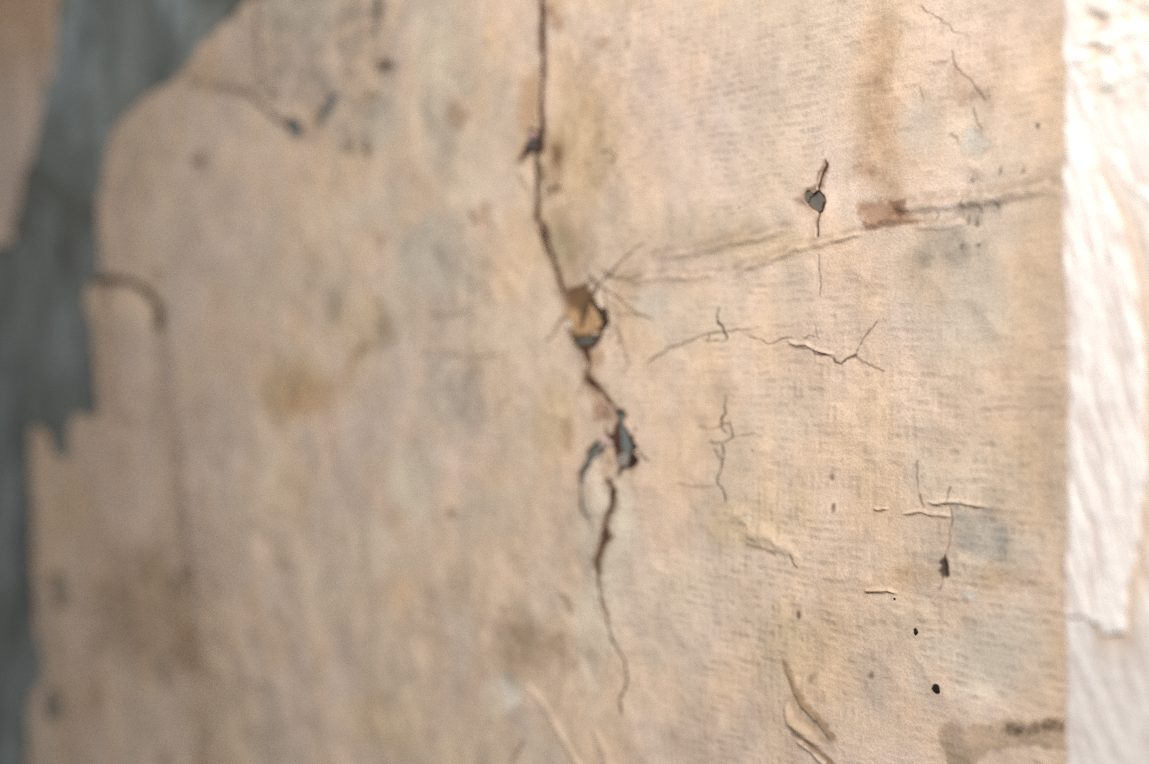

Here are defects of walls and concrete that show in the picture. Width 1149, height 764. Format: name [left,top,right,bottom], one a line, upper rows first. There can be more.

crack [531,0,651,339]
peeling [0,0,249,764]
crack [579,336,621,413]
crack [651,307,782,360]
crack [715,405,733,500]
crack [595,479,628,714]
crack [940,558,948,577]
peeling [783,663,833,739]